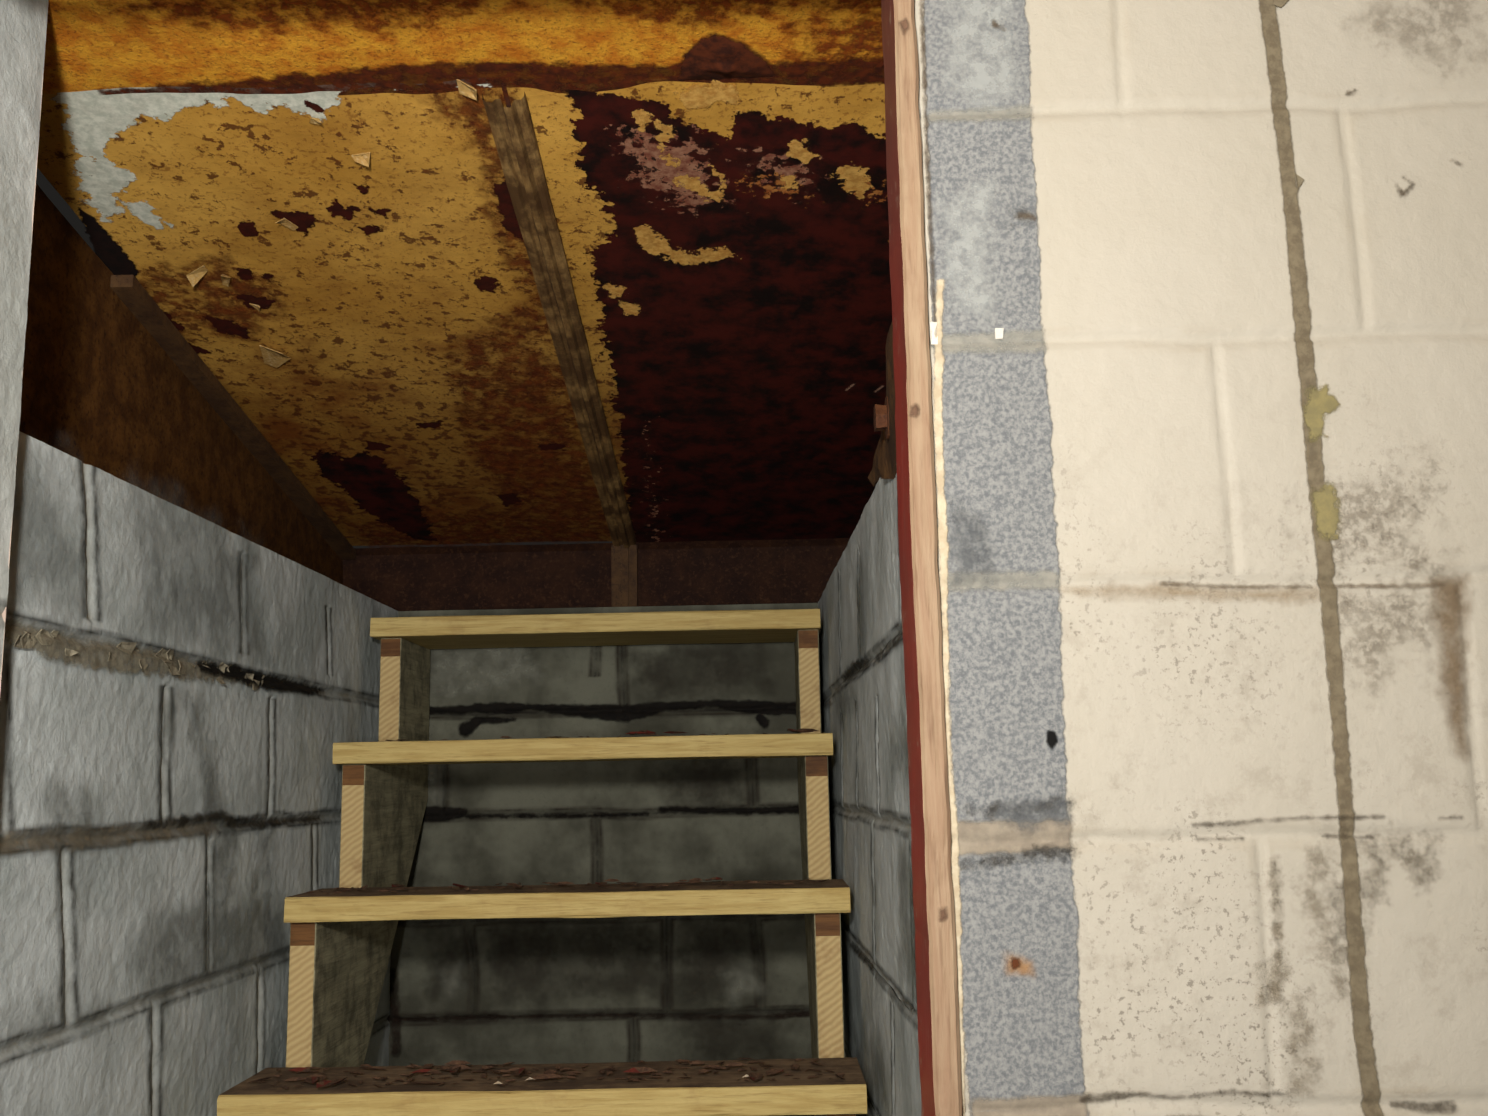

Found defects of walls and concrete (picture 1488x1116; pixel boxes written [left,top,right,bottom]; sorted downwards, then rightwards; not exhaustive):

peeling [275,218,298,231]
rust [99,0,892,548]
crack [197,661,323,695]
crack [429,626,903,736]
crack [145,811,319,829]